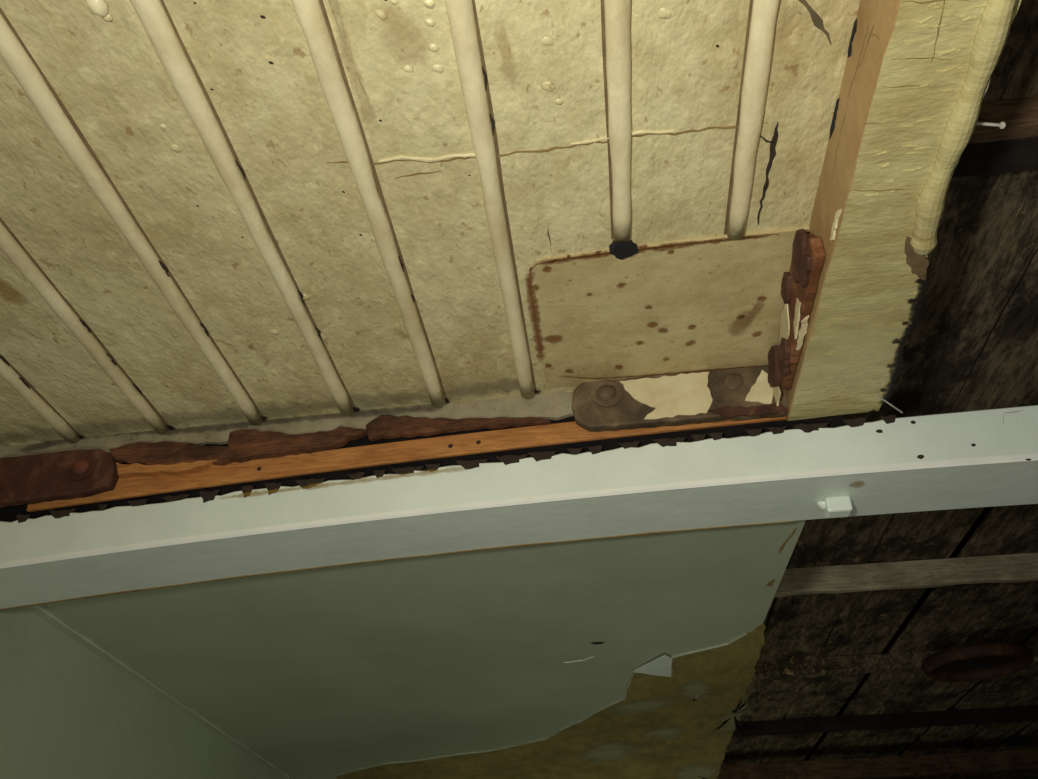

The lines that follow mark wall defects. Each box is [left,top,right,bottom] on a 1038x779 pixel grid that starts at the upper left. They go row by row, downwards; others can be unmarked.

crack [832,0,969,192]
crack [326,122,778,225]
corrosion [638,234,779,254]
corrosion [526,251,610,368]
corrosion [565,358,755,379]
peeling [337,623,766,779]